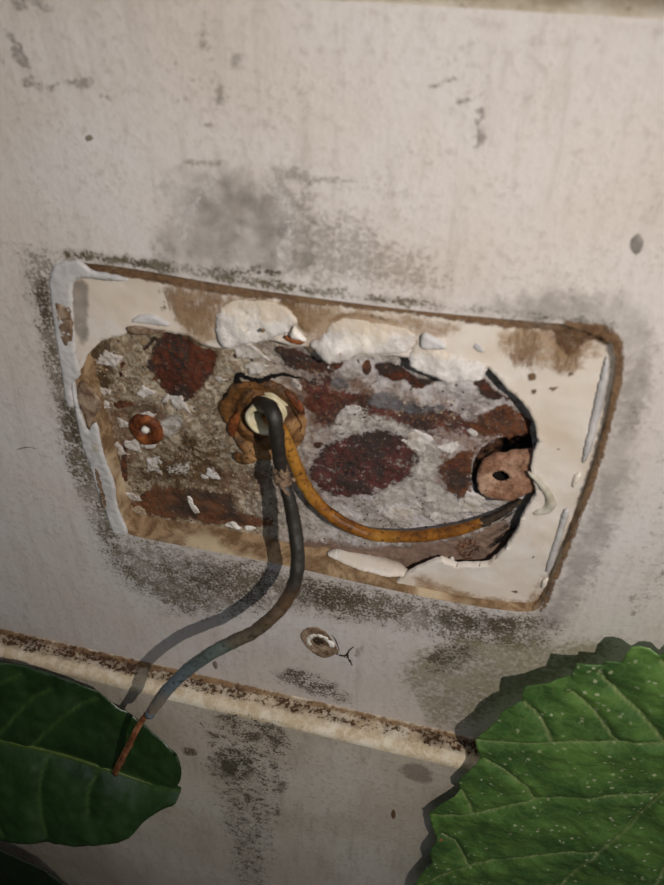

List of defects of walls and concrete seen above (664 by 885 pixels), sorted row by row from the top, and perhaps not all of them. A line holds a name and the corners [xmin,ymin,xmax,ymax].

leakage [64,176,610,394]
peeling [126,314,171,335]
corrosion [143,332,218,402]
peeling [284,326,306,345]
leakage [32,273,287,621]
peeling [167,462,190,475]
corrosion [275,346,532,499]
corrosion [0,629,178,680]
hole [300,627,339,658]
leakage [298,576,563,650]
corrosion [179,673,479,757]
leakage [183,710,299,885]